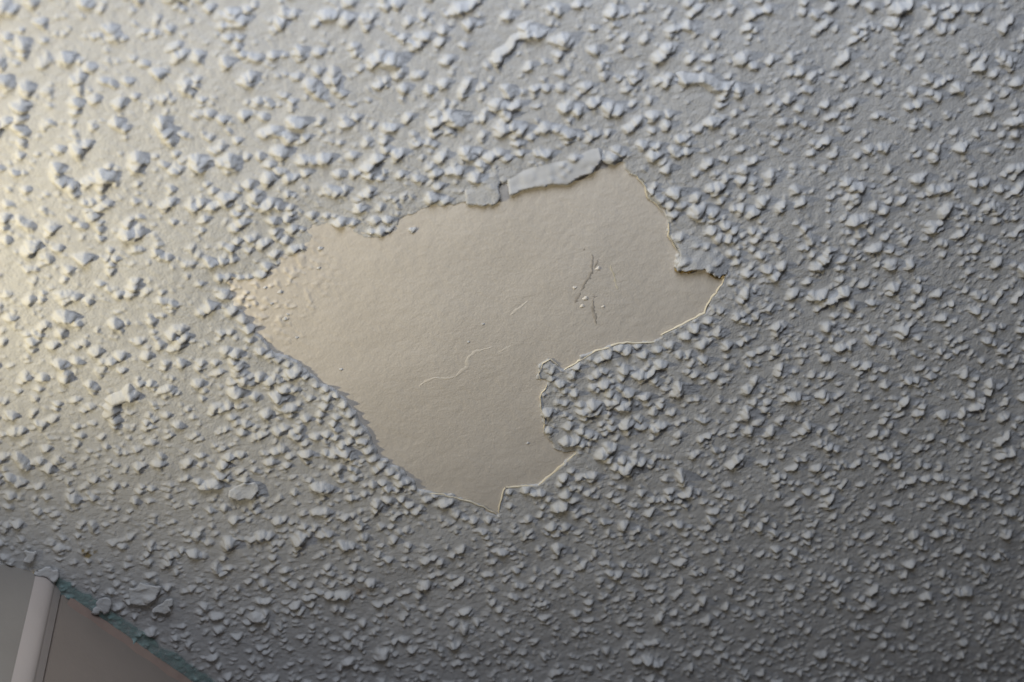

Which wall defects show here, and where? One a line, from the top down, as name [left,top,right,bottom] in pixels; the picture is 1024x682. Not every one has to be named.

peeling [227,147,728,515]